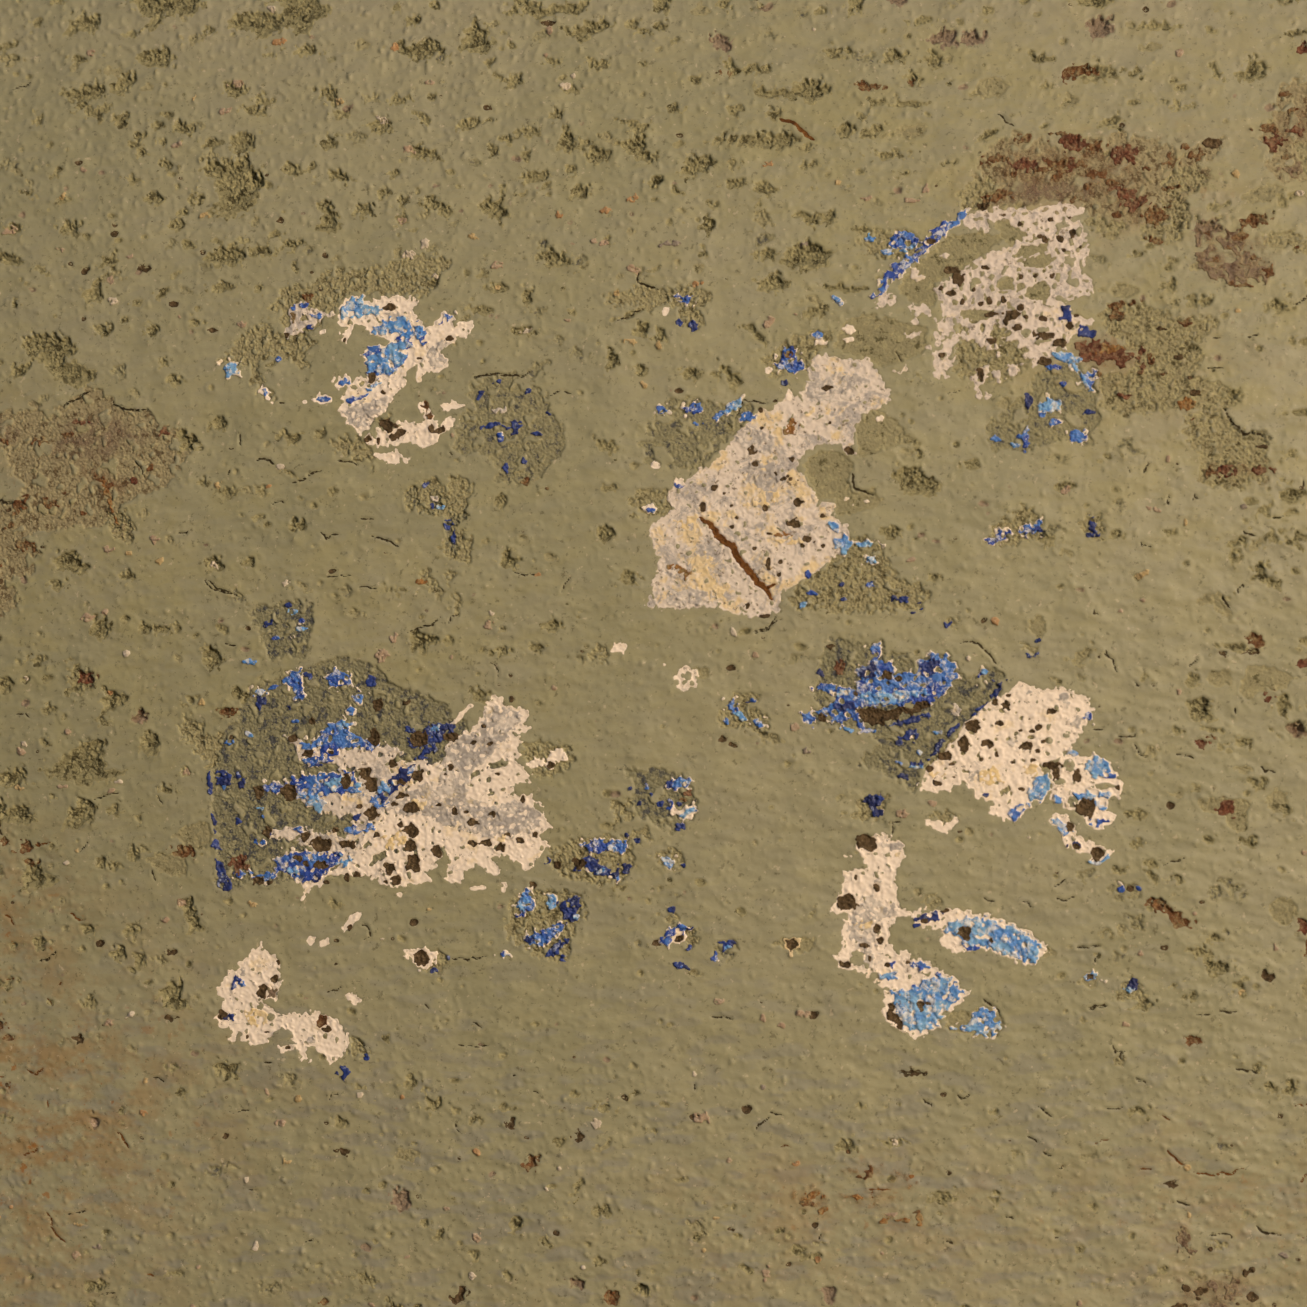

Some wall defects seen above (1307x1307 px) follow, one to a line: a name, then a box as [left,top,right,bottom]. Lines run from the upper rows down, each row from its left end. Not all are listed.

spalling [1269,0,1307,54]
rust [1250,77,1307,183]
rust [955,130,1307,288]
spalling [1187,157,1305,238]
rust [0,386,199,617]
peeling [0,0,1275,1047]
crack [699,517,782,634]
spalling [1215,449,1307,601]
spalling [552,1057,644,1153]
spalling [899,1066,928,1077]
spalling [1232,1054,1300,1097]
spalling [563,1242,656,1306]